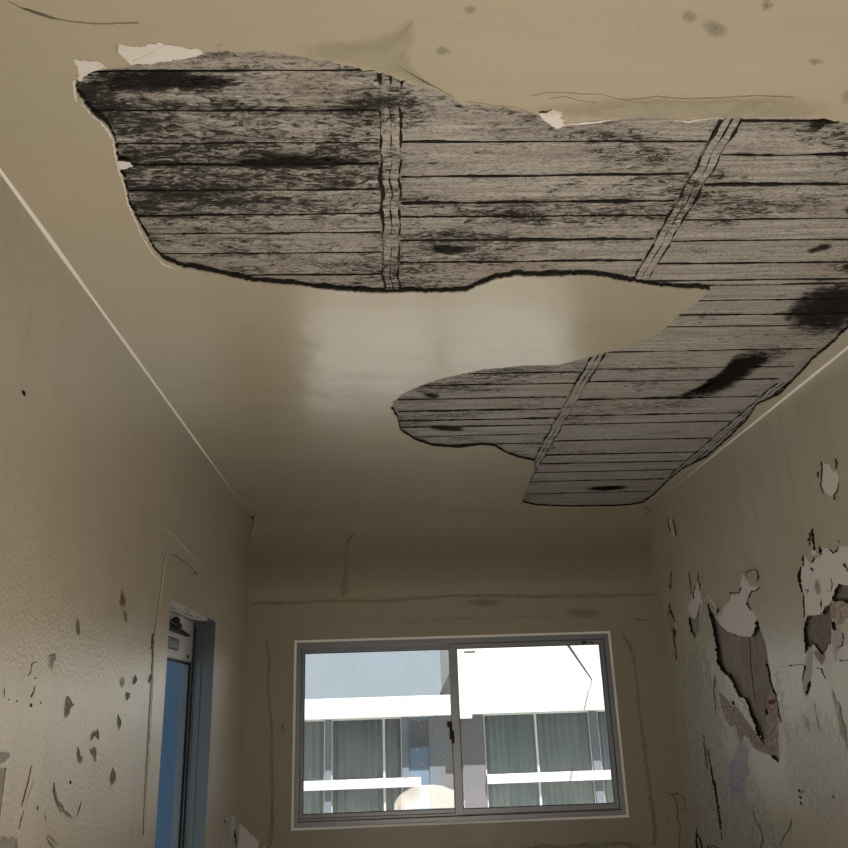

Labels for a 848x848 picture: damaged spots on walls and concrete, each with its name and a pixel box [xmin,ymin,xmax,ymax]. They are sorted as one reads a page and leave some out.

spalling [72,42,848,507]
peeling [77,729,99,762]
crack [142,526,219,835]
peeling [223,816,274,848]
flaking render [685,569,781,845]
peeling [797,545,848,696]